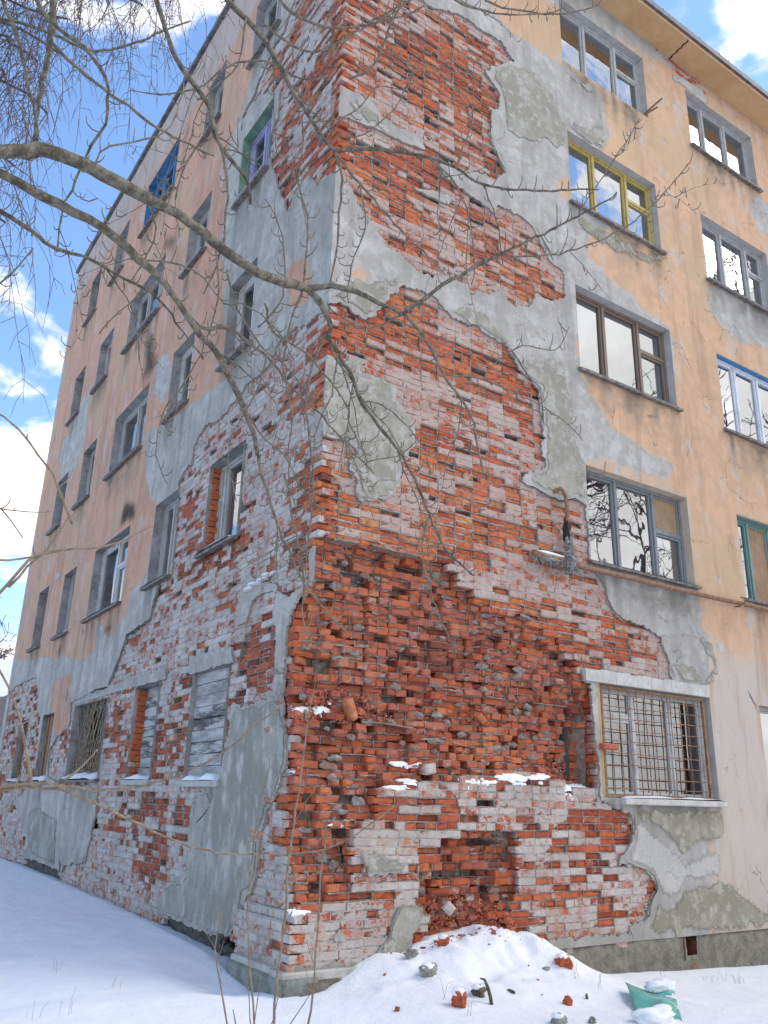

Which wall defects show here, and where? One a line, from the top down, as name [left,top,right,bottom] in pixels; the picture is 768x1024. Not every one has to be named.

spalling [245,0,566,307]
spalling [0,278,718,972]